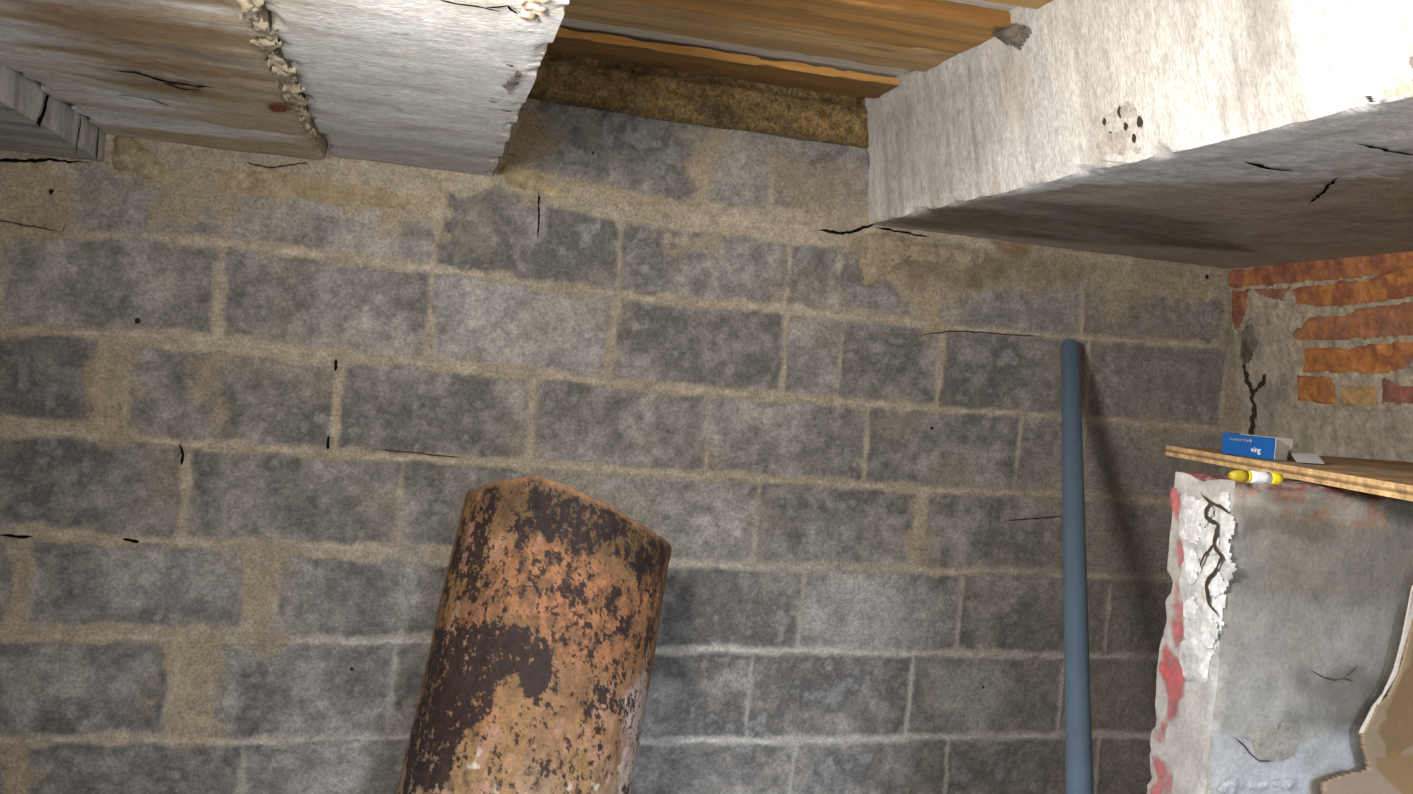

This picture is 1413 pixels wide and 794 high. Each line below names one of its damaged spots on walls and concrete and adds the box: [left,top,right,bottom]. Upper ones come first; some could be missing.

crack [114,70,215,106]
spalling [1363,56,1413,102]
crack [0,95,99,163]
crack [820,224,927,237]
flaking render [1227,252,1413,412]
crack [1243,364,1266,435]
crack [1005,514,1061,522]
crack [1200,492,1228,618]
peeling [1242,723,1301,761]